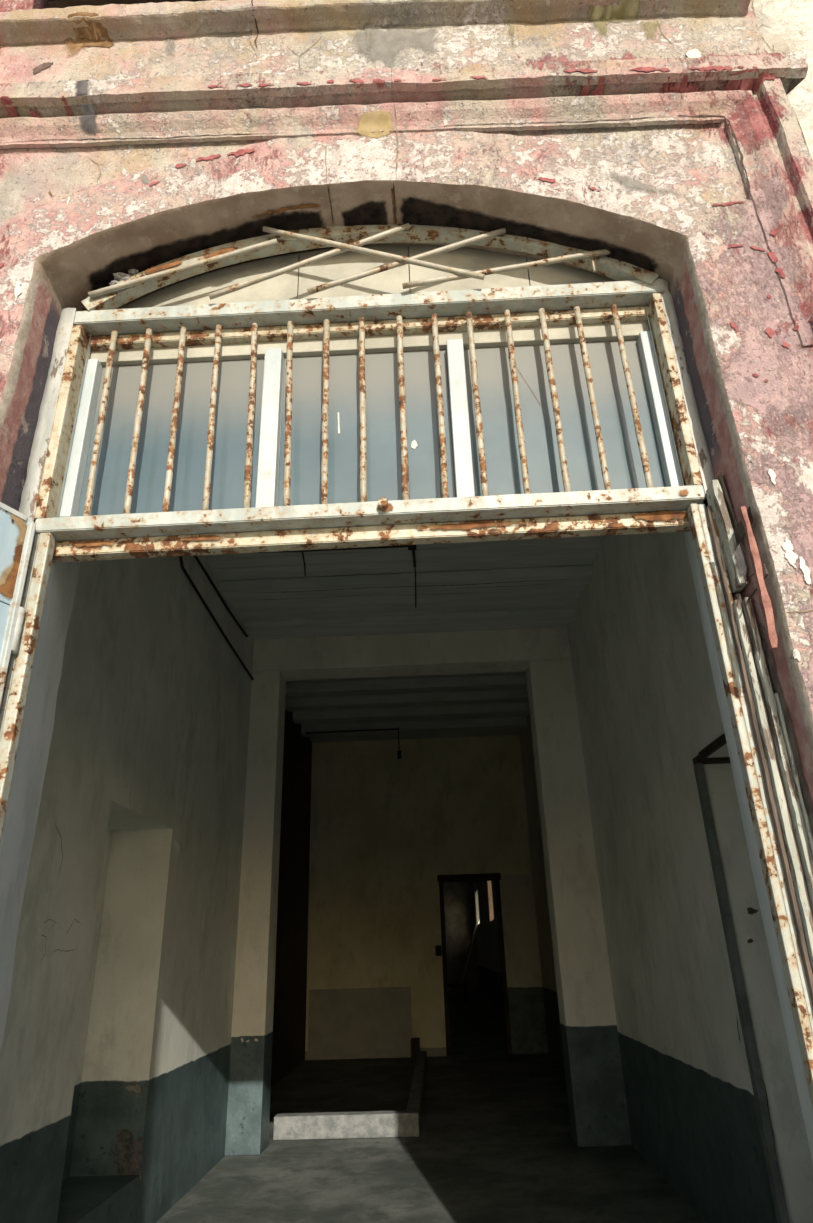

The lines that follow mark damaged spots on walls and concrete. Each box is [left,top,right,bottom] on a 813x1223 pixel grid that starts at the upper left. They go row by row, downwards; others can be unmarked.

peeling [728,244,786,278]
corrosion [416,521,526,530]
flaking render [739,506,777,650]
peeling [781,536,812,585]